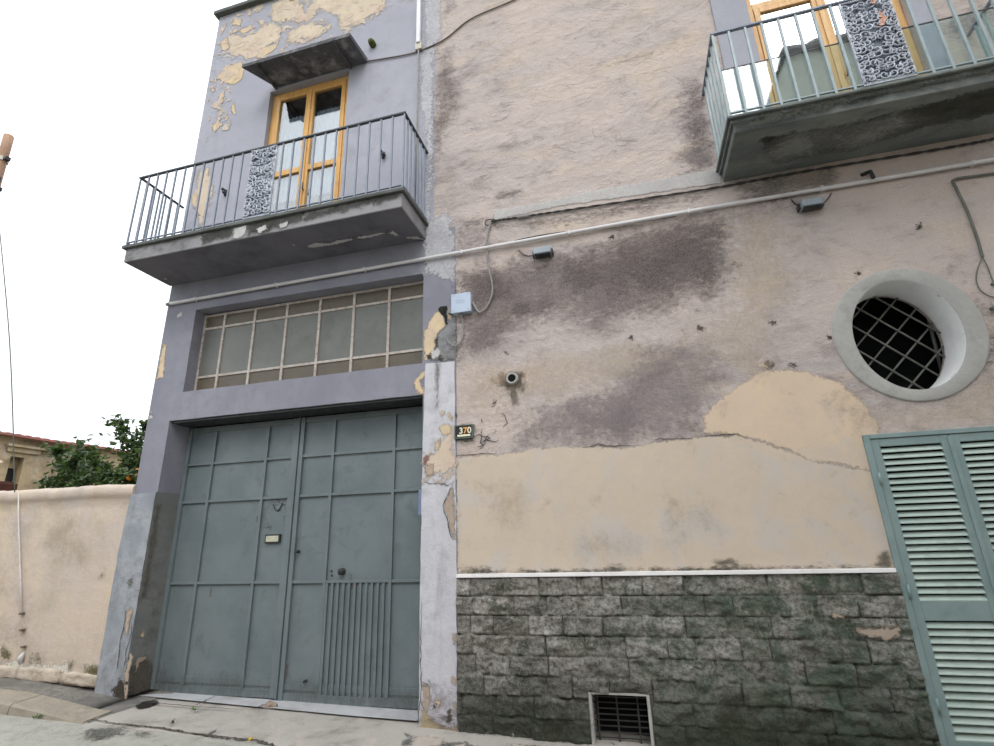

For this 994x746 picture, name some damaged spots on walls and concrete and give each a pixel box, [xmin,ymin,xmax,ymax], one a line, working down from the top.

peeling [205,0,443,221]
peeling [233,225,267,239]
damp [457,213,733,359]
flaking render [412,306,458,394]
crack [656,432,744,440]
peeling [421,410,458,539]
spalling [856,624,902,643]
flaking render [110,652,146,699]
flaking render [402,684,473,746]